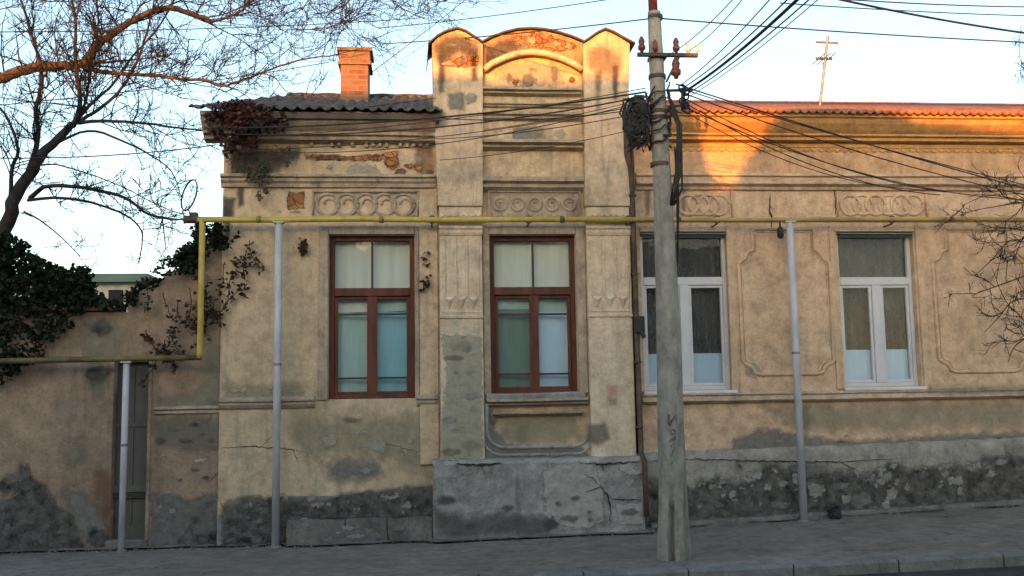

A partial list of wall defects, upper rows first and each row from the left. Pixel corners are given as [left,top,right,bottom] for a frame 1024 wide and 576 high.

flaking render [511,32,576,52]
flaking render [304,147,433,174]
flaking render [286,191,305,212]
flaking render [439,334,495,460]
crack [224,439,301,461]
crack [687,458,900,470]
crack [580,460,656,525]
flaking render [687,454,1024,520]
flaking render [0,464,83,551]